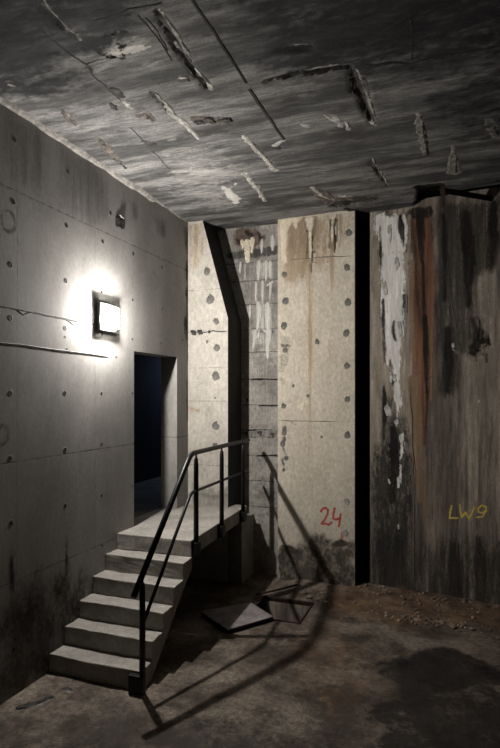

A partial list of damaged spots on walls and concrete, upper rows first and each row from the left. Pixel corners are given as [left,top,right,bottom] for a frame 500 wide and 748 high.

crack [94,2,172,61]
spalling [152,8,214,90]
spalling [149,91,234,140]
spalling [261,63,379,126]
crack [130,127,169,169]
crack [0,306,94,326]
water stain [229,214,342,359]
crack [0,342,108,357]
peeling [373,212,408,488]
corrosion [407,206,435,515]
water stain [370,199,500,605]
water stain [278,535,355,587]